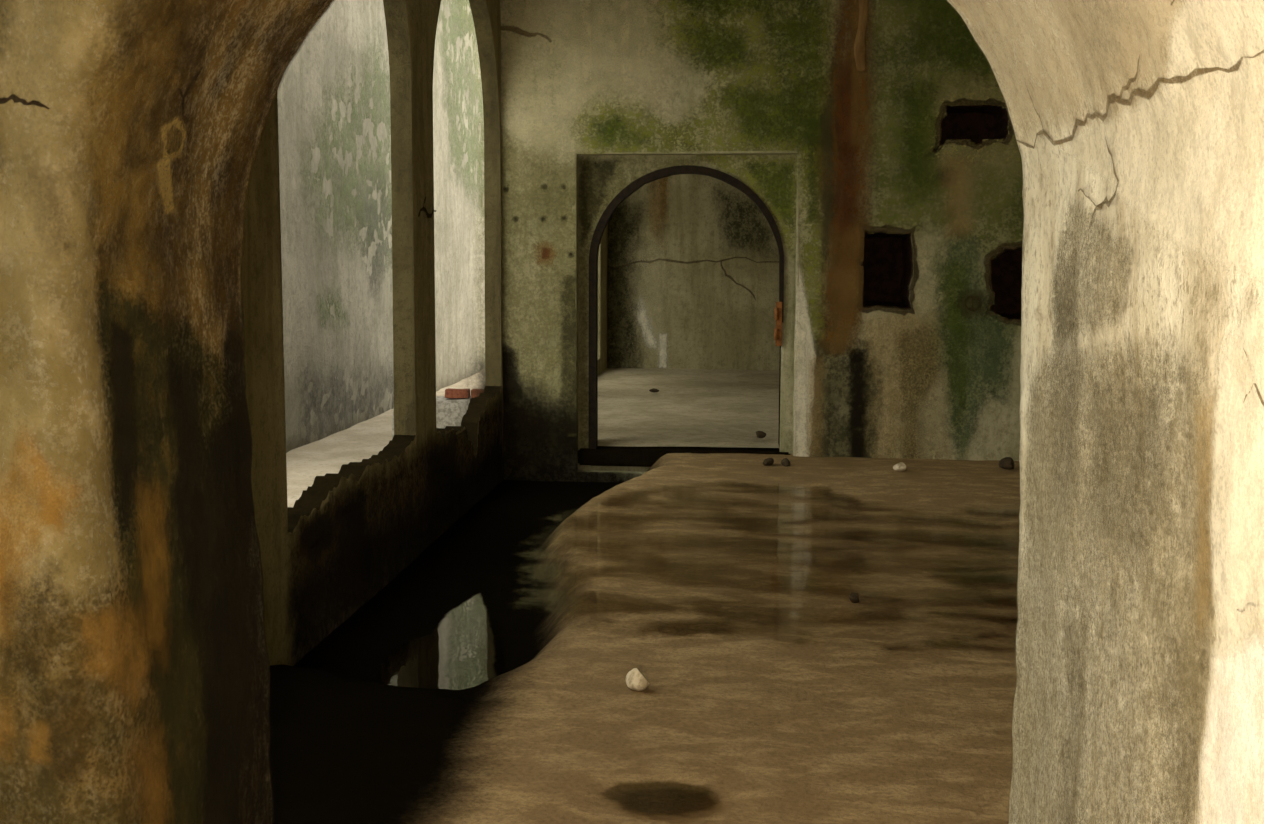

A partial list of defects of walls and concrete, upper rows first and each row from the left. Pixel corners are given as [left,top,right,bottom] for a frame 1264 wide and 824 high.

crack [0,94,49,109]
leakage [0,0,334,824]
leakage [717,190,771,251]
leakage [794,268,879,458]
rust [819,0,872,351]
spalling [857,224,919,315]
leakage [896,242,970,459]
spalling [924,98,1014,157]
spalling [984,241,1023,326]
crack [1015,50,1264,229]